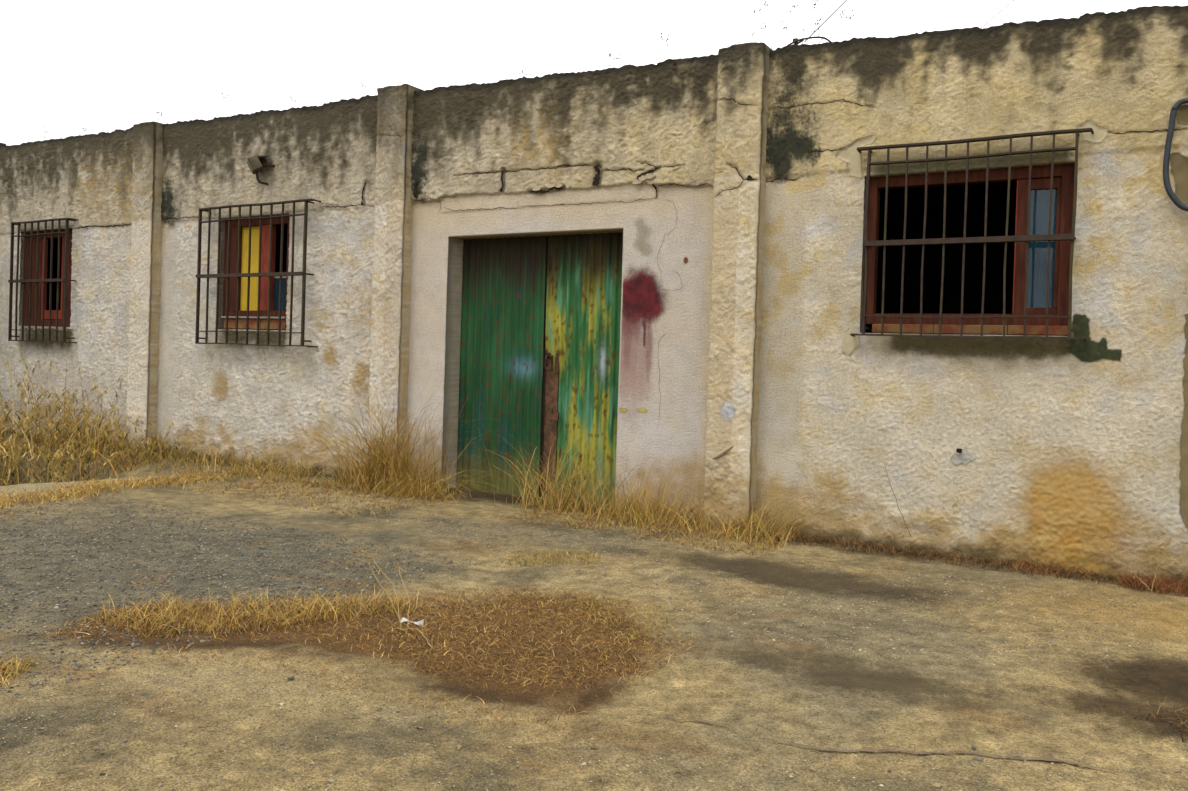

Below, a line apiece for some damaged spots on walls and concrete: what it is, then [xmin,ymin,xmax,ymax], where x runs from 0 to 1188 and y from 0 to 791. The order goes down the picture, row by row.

water stain [766,72,821,183]